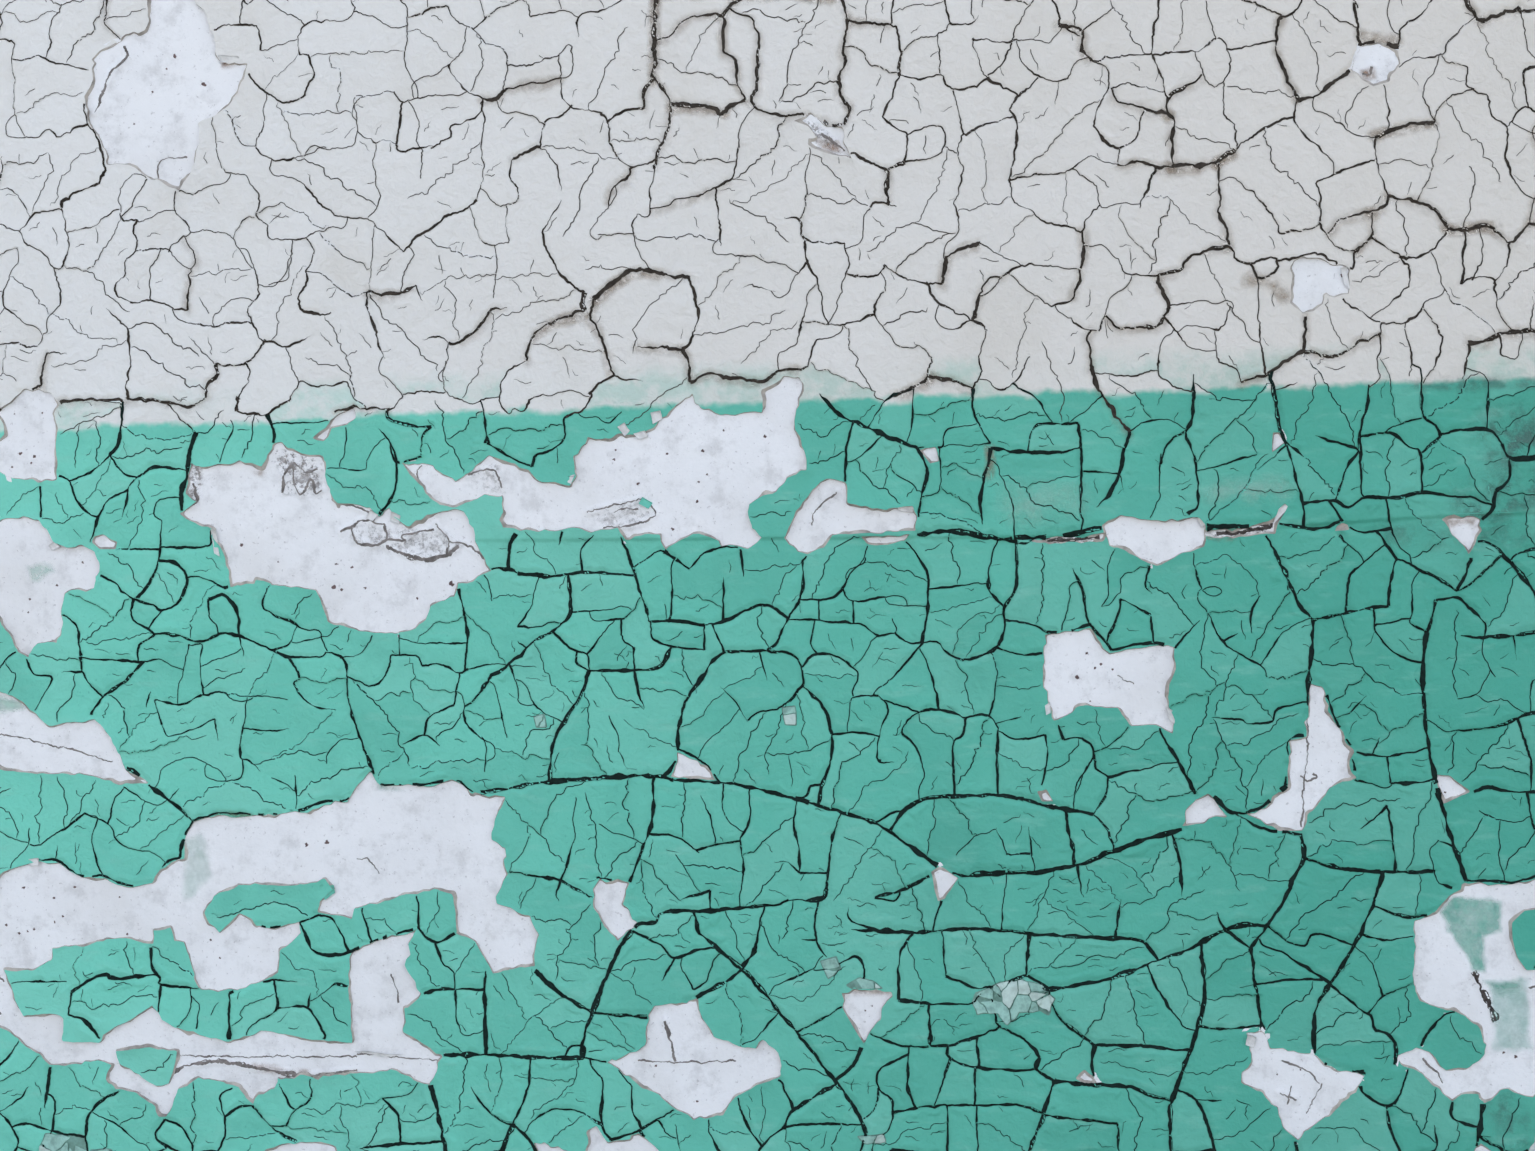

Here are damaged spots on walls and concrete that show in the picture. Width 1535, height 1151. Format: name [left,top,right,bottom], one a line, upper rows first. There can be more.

crack [0,0,142,92]
peeling [180,376,807,634]
crack [26,659,53,710]
peeling [1043,628,1176,733]
crack [39,845,84,877]
crack [12,945,348,1040]
peeling [0,772,539,1116]
peeling [608,998,781,1120]
peeling [1241,1027,1364,1145]
crack [1352,1069,1520,1151]
crack [1420,1011,1481,1054]
peeling [1393,879,1535,1103]